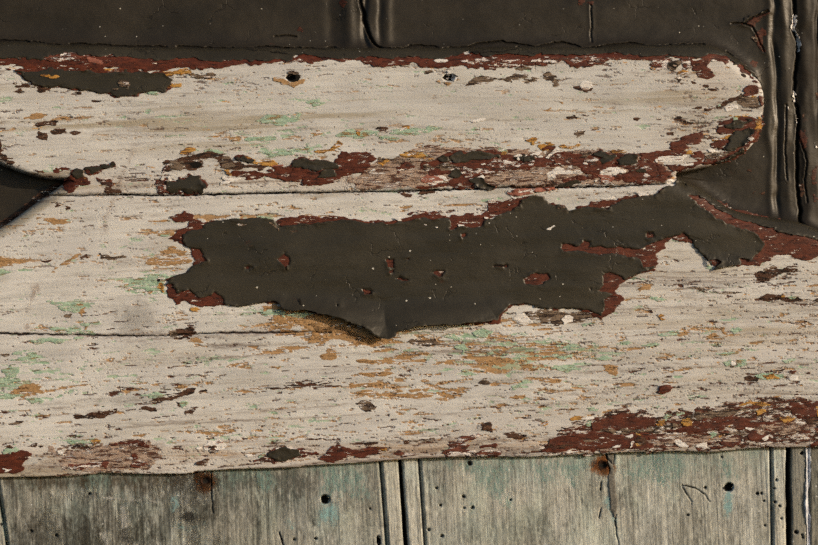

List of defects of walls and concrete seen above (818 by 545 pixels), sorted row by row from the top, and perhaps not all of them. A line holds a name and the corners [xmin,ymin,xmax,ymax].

crack [359,0,701,53]
peeling [0,42,818,412]
crack [0,330,297,338]
peeling [73,385,208,419]
peeling [0,437,162,474]
peeling [196,439,226,465]
peeling [245,438,435,464]
peeling [442,434,503,458]
peeling [504,431,526,440]
corrosion [590,455,615,475]
peeling [539,394,818,456]